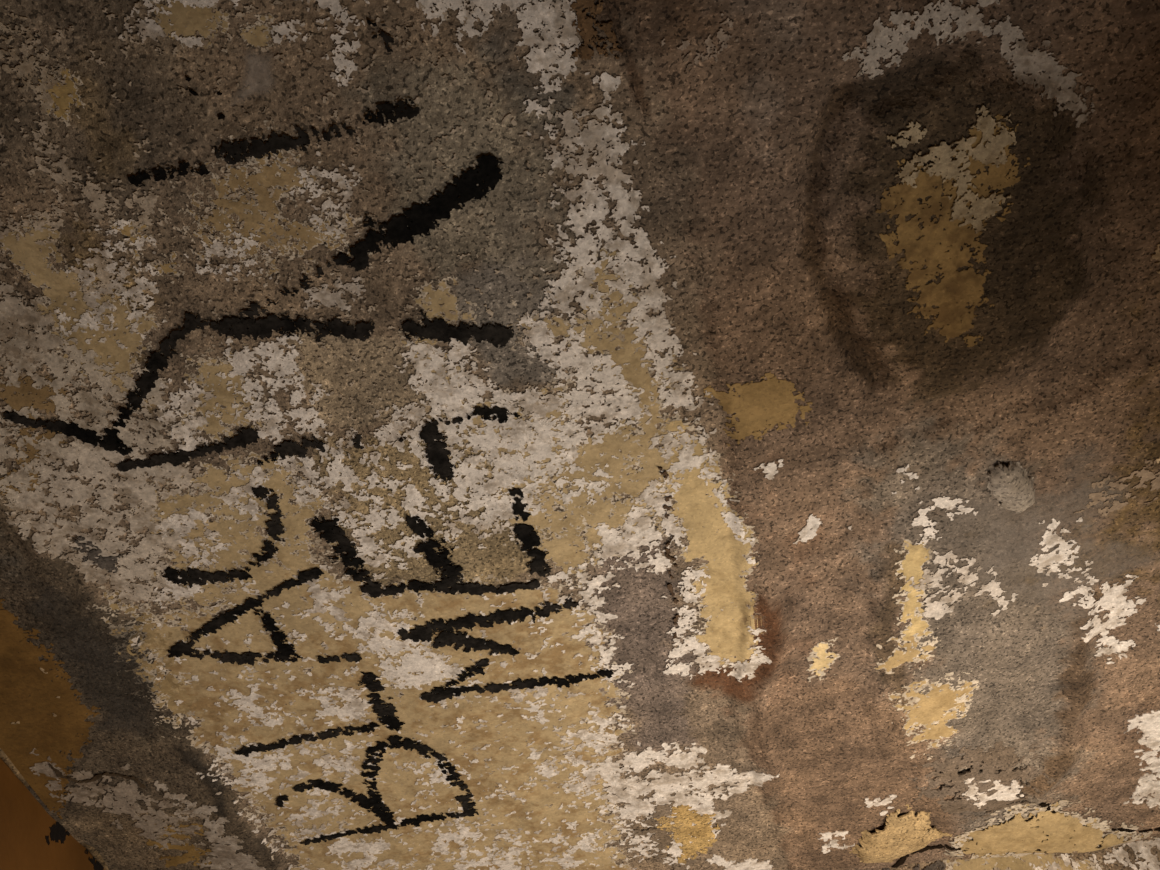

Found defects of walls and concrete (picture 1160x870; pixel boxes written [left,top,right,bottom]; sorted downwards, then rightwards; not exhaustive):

peeling [876,105,1031,347]
peeling [0,0,813,870]
peeling [793,513,822,544]
leakage [964,484,1149,602]
peeling [1028,456,1160,664]
peeling [804,637,840,682]
peeling [817,831,855,854]
peeling [864,794,897,816]
peeling [1123,710,1160,808]